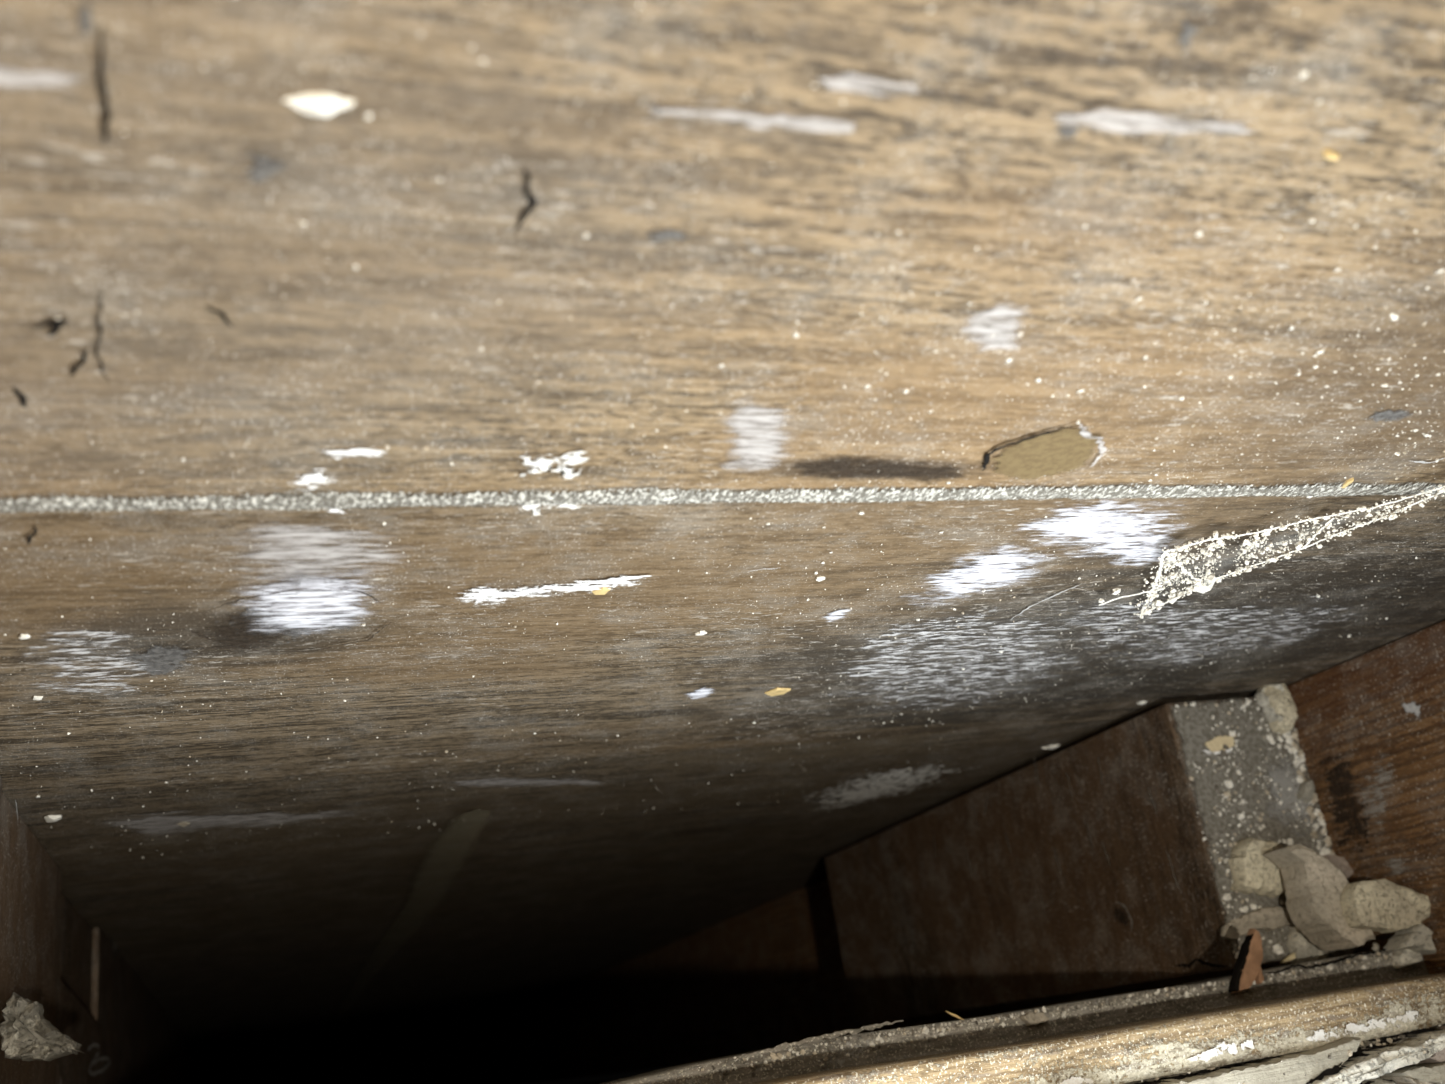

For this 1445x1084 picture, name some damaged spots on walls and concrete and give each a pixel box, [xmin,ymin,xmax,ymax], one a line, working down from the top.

damp [195,526,390,649]
damp [455,575,651,605]
damp [929,502,1168,598]
damp [801,760,978,811]